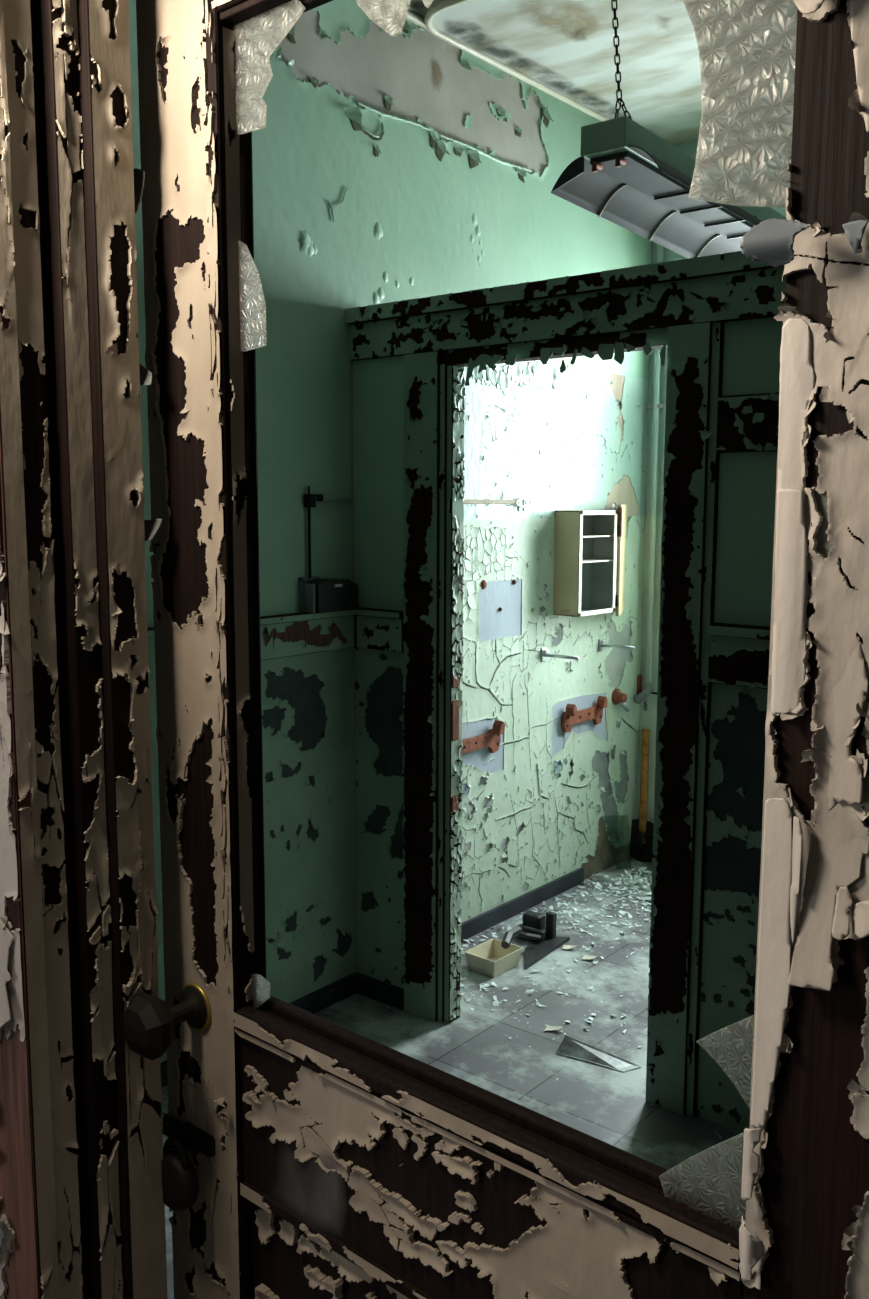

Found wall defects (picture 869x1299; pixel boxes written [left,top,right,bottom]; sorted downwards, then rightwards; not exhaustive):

peeling [110,78,128,127]
peeling [193,78,207,134]
spalling [274,9,554,183]
peeling [18,336,47,568]
peeling [105,168,145,357]
peeling [139,211,210,630]
peeling [365,467,436,985]
crack [462,525,599,909]
peeling [387,0,869,1299]
crack [840,530,865,590]
crack [843,358,869,392]
peeling [166,718,219,986]